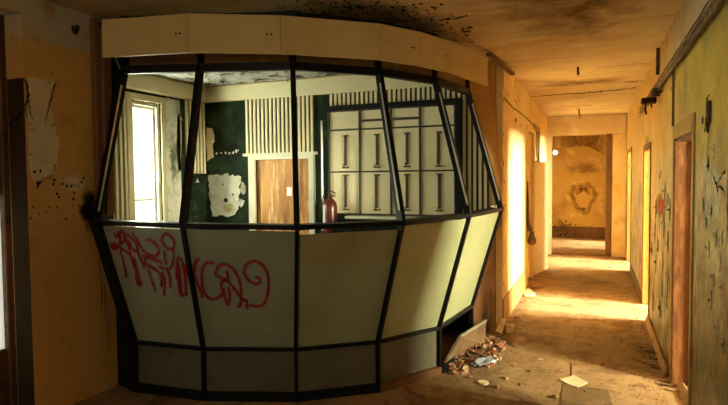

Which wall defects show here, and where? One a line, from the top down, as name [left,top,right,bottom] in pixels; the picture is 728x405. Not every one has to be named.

damp [296,0,465,34]
peeling [6,77,89,200]
peeling [208,173,246,217]
damp [571,183,597,214]